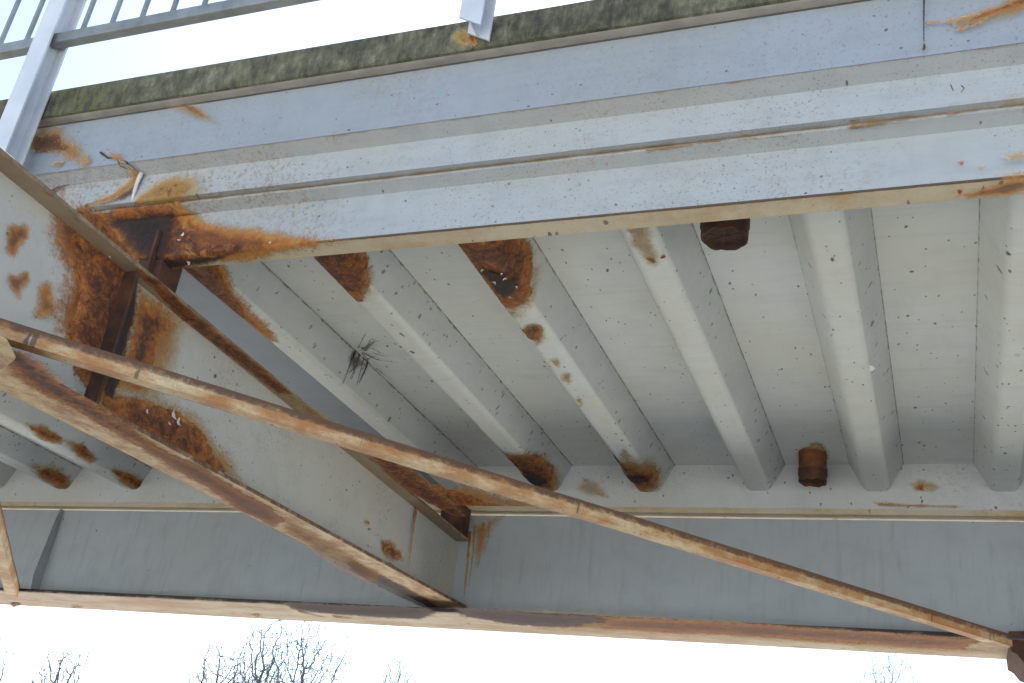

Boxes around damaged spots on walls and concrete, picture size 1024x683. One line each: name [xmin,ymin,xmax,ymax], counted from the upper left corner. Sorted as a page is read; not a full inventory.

corrosion [30,129,89,166]
corrosion [7,224,28,255]
corrosion [9,272,29,296]
corrosion [34,177,370,422]
corrosion [458,238,535,316]
corrosion [522,325,543,343]
corrosion [9,351,285,529]
corrosion [500,449,560,491]
corrosion [613,450,661,492]
corrosion [364,454,533,593]
corrosion [348,561,437,608]